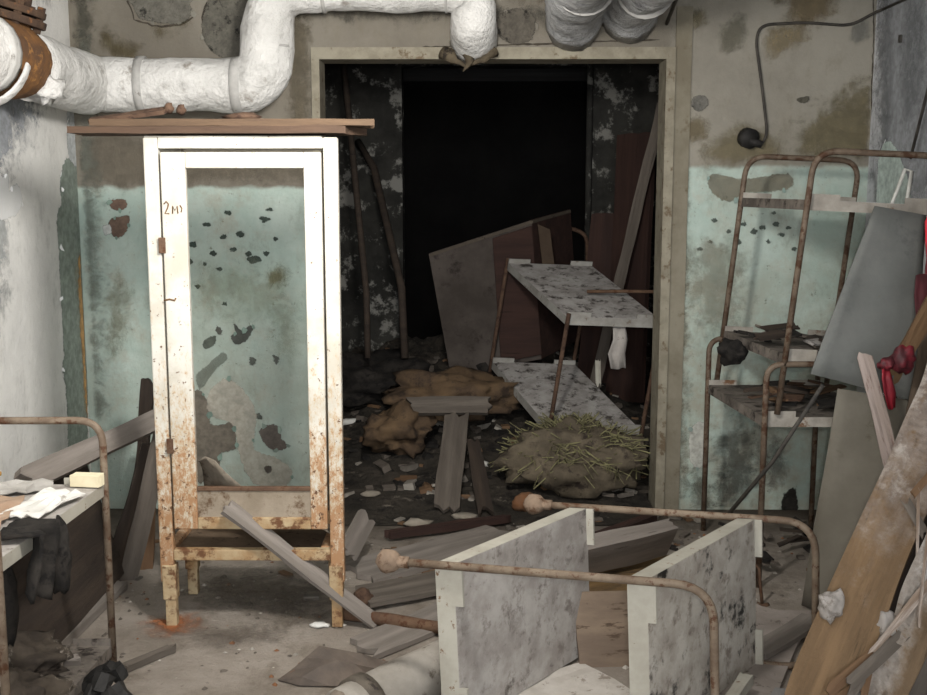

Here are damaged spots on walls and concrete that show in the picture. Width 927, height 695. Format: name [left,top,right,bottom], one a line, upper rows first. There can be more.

spalling [691,95,709,112]
water stain [800,0,927,199]
water stain [0,99,39,167]
peeling [707,173,793,203]
peeling [102,199,130,240]